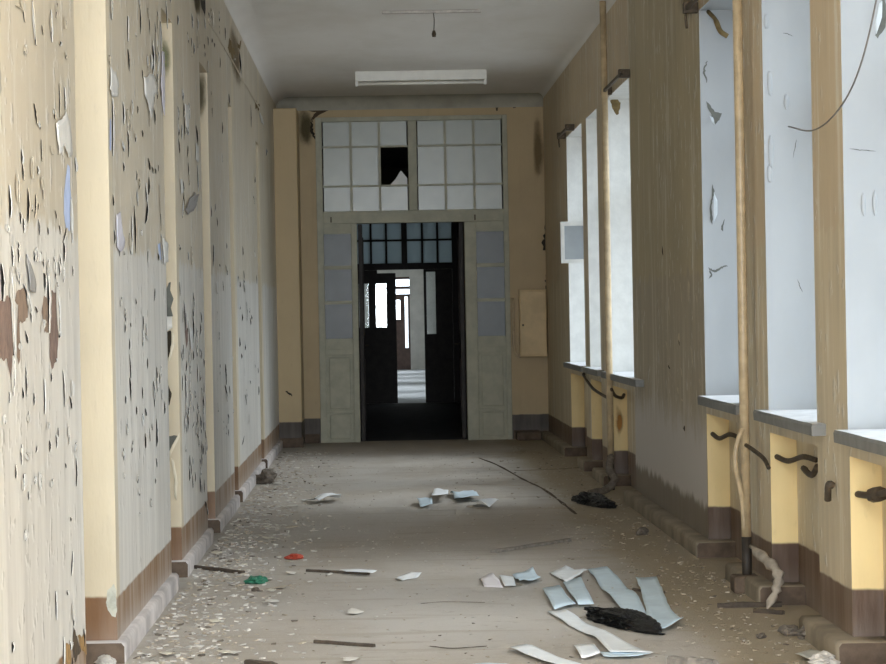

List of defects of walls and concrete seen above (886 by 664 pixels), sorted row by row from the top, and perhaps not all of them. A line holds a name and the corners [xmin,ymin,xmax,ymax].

peeling [15,0,69,59]
peeling [108,0,242,171]
peeling [178,90,199,218]
peeling [113,158,168,265]
spalling [0,83,78,500]
peeling [213,245,252,323]
peeling [217,337,246,436]